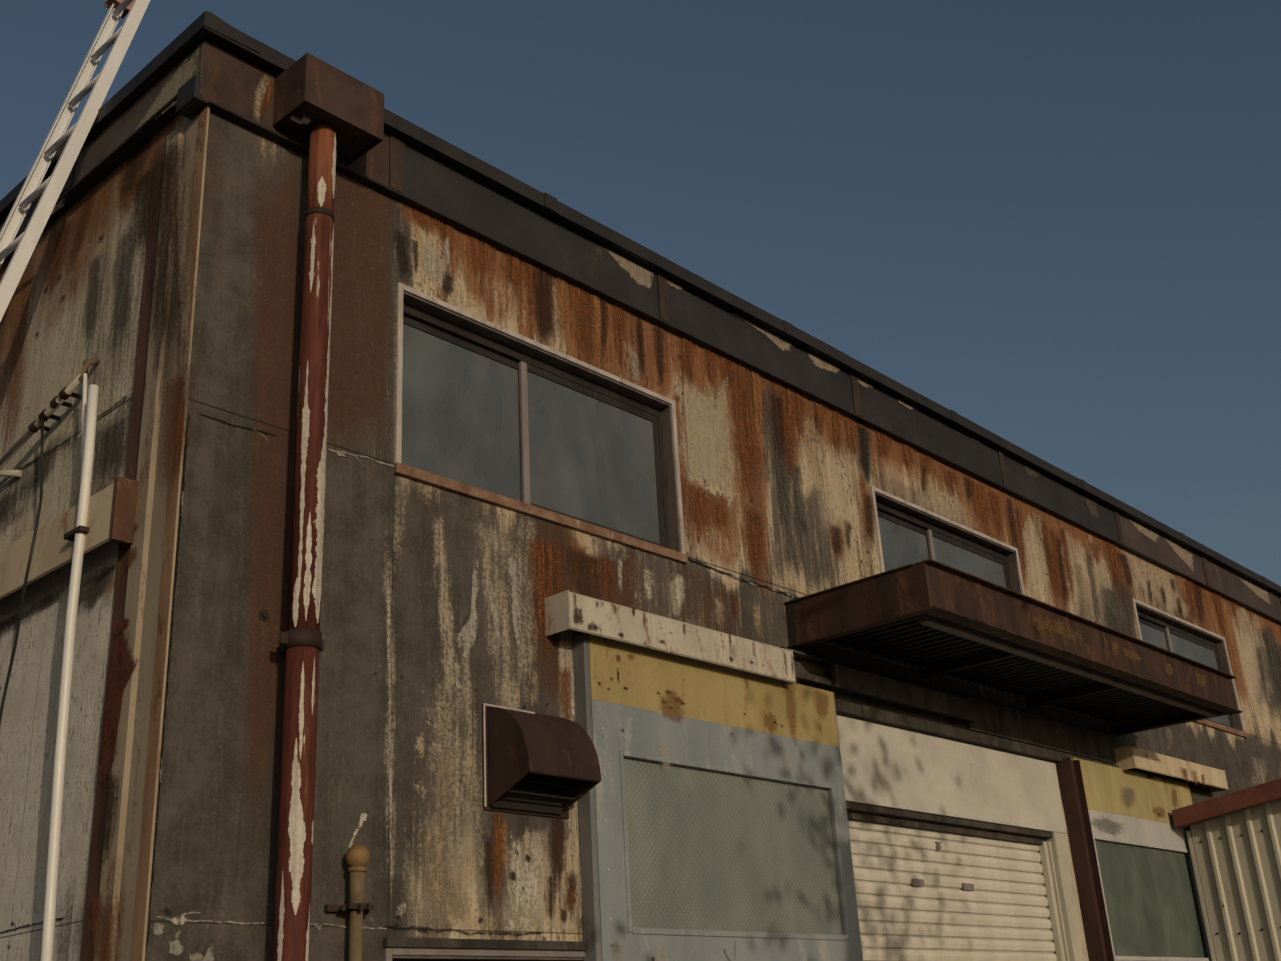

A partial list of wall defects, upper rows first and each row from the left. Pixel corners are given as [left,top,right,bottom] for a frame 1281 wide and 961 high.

rust [3,260,30,394]
rust [414,208,666,383]
rust [730,360,857,486]
rust [529,540,616,643]
rust [831,495,875,557]
rust [878,432,1133,624]
rust [97,617,137,868]
spalling [151,922,214,961]
peeling [277,658,315,961]
crack [310,917,387,931]
damp [424,750,469,919]
rust [546,818,576,922]